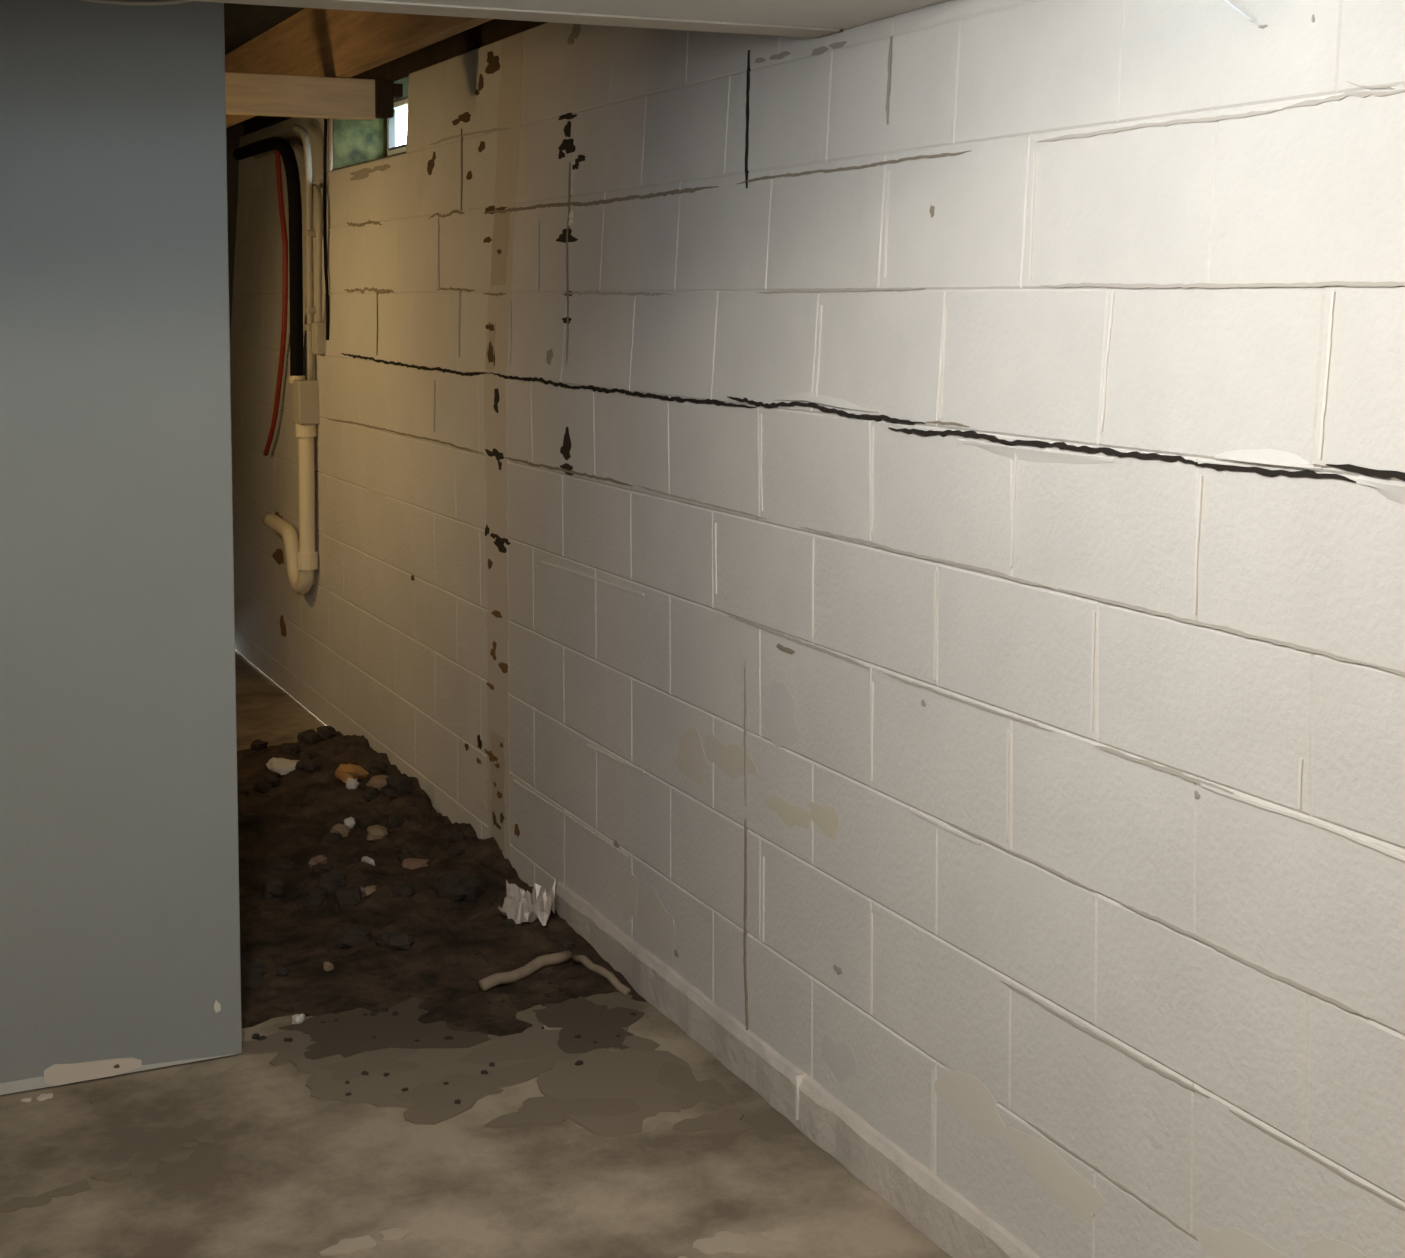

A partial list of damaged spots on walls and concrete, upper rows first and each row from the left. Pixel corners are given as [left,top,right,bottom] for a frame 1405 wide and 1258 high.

crack [330,50,1405,519]
crack [885,36,893,125]